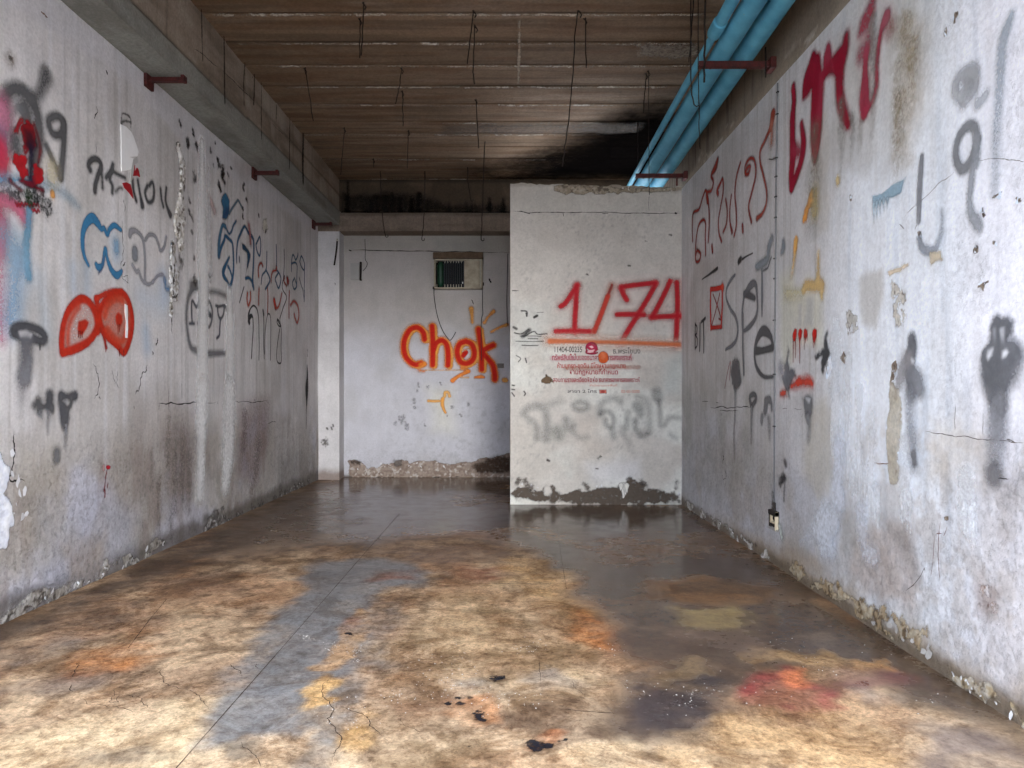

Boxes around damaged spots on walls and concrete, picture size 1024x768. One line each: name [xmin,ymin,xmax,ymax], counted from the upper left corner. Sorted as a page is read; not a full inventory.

peeling [169,143,186,331]
crack [161,396,275,424]
peeling [886,361,904,484]
crack [926,407,1020,443]
spalling [348,453,510,477]
spalling [1,538,165,624]
spalling [789,561,932,660]
crack [316,681,416,757]
spalling [951,671,997,705]